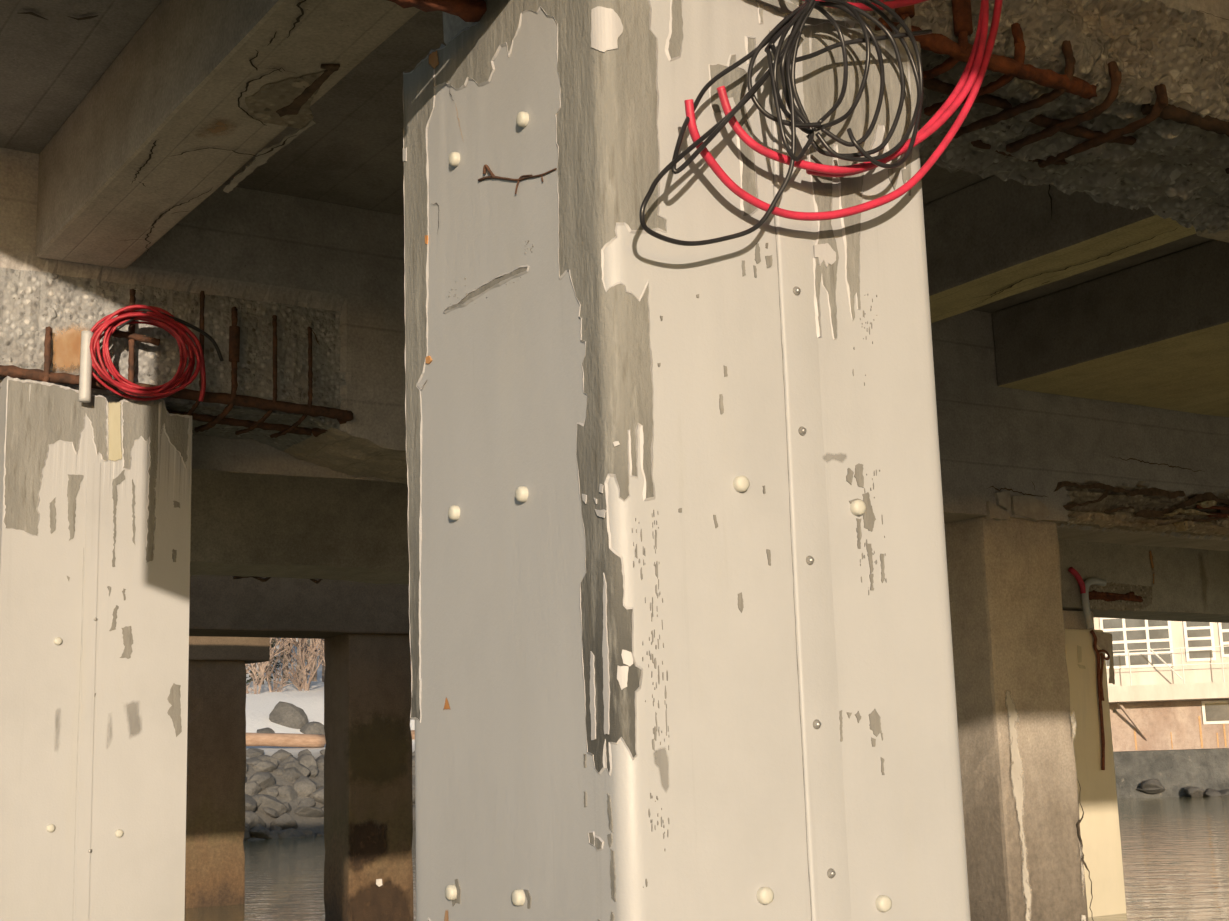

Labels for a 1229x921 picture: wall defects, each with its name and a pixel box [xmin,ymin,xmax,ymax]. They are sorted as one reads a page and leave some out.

crack [132,0,306,187]
spalling [708,0,1229,350]
crack [120,187,213,257]
spalling [0,267,353,567]
peeling [387,0,684,851]
peeling [846,463,887,595]
spalling [1054,481,1229,539]
peeling [107,586,133,659]
peeling [1094,631,1115,684]
peeling [167,683,182,737]
water stain [349,821,387,871]
water stain [348,881,410,921]